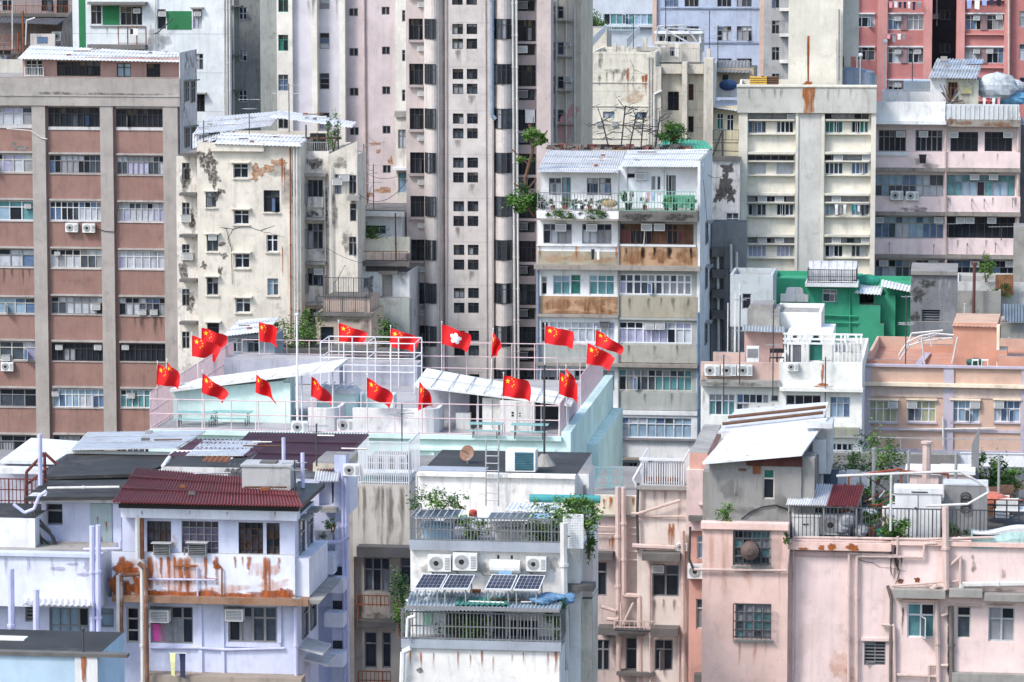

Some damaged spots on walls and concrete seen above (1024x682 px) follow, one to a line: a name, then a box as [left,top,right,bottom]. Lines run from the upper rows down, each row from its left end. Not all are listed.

corrosion [801,36,815,114]
spalling [196,148,225,201]
spalling [250,158,287,182]
spalling [713,163,736,203]
corrosion [798,543,859,551]
corrosion [108,557,295,598]